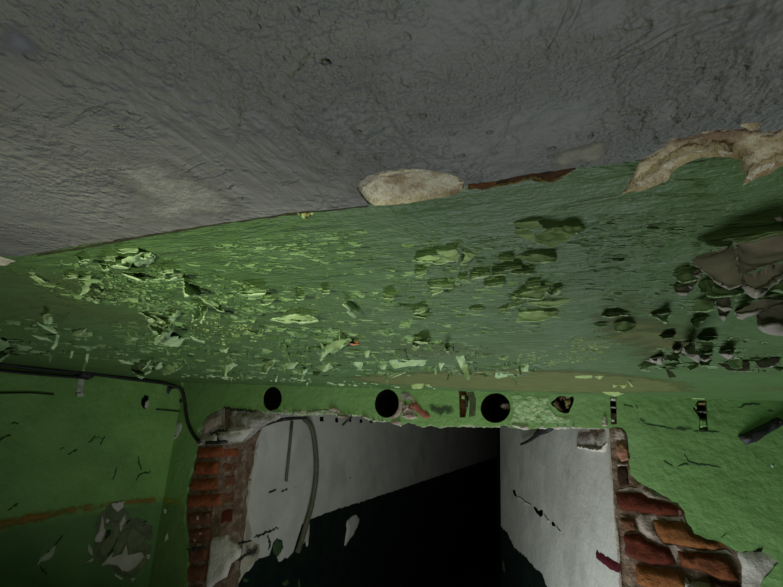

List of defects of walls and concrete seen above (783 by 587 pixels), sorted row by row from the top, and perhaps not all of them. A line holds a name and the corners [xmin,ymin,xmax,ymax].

flaking render [358,168,466,205]
rust [468,168,576,190]
flaking render [622,123,783,194]
peeling [0,216,783,587]